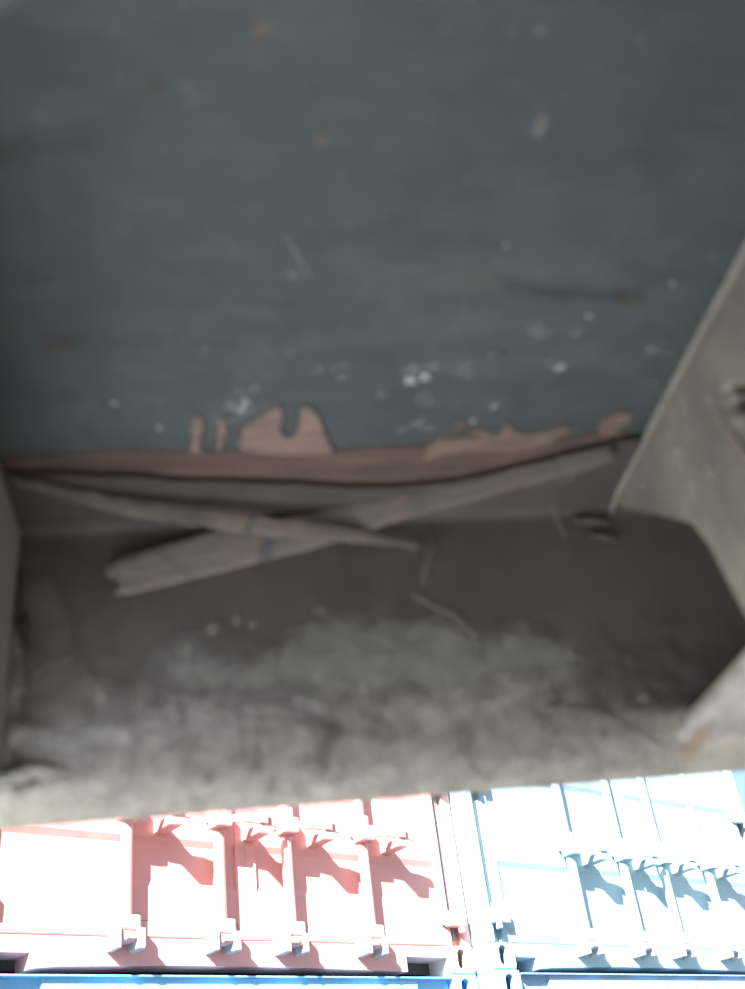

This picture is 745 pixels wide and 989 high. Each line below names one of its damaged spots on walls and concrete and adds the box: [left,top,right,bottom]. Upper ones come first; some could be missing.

peeling [0,405,632,488]